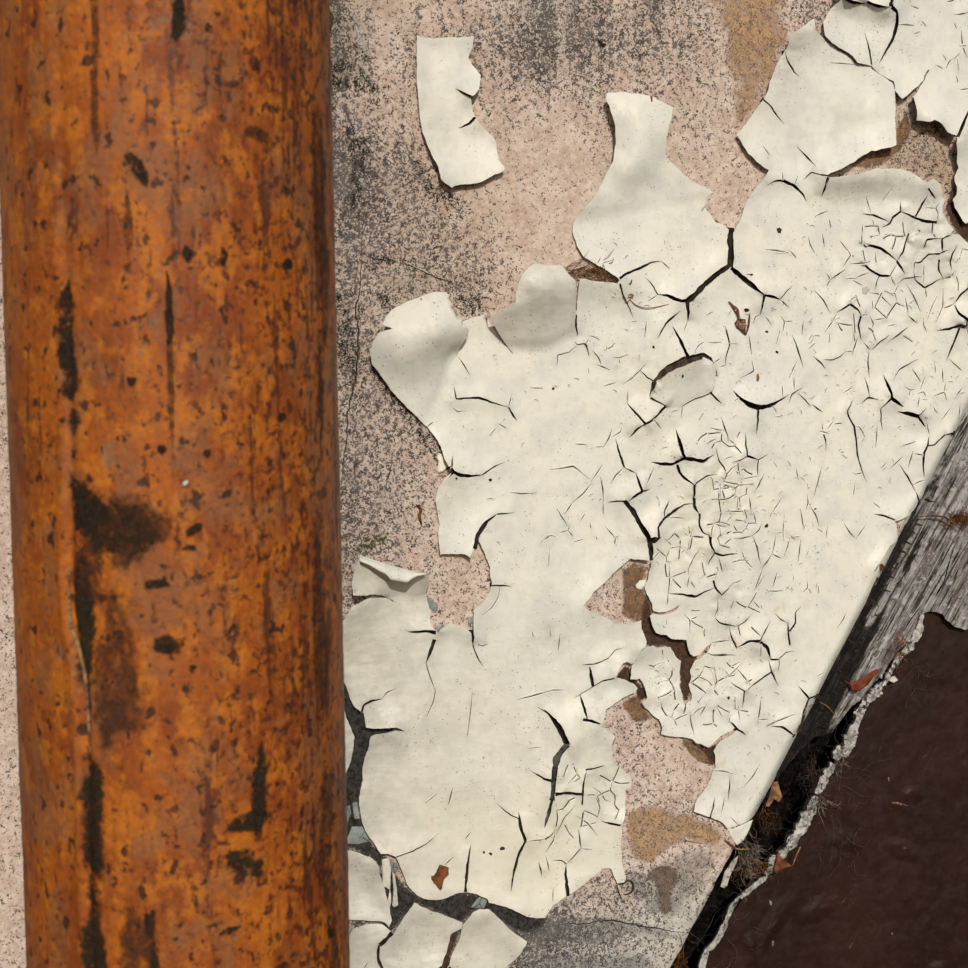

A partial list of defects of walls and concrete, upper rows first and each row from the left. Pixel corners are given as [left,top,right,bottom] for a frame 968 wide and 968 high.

damp [330,4,388,107]
damp [414,139,469,211]
damp [457,292,486,317]
crack [340,227,464,489]
peeling [343,0,968,968]
crack [446,145,968,826]
crack [357,688,395,712]
crack [409,629,438,717]
crack [425,788,454,804]
crack [500,648,693,943]
crack [445,832,471,892]
crack [363,932,393,968]